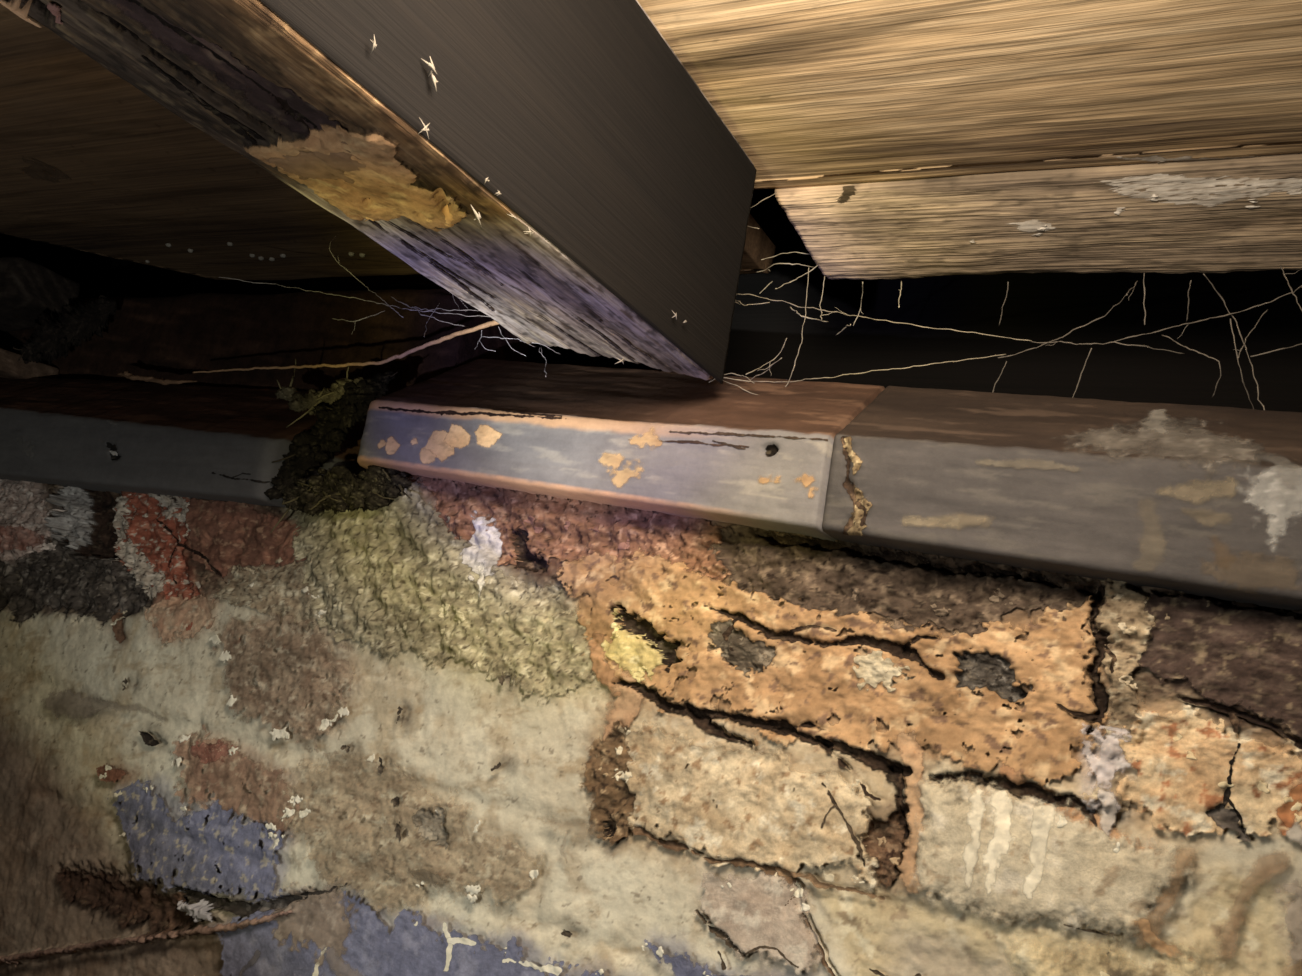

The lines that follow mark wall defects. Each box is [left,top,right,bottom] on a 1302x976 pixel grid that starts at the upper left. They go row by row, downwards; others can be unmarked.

corrosion [378,424,502,464]
leakage [460,511,503,600]
corrosion [599,428,662,487]
corrosion [796,474,814,498]
leakage [903,514,988,528]
leakage [978,460,1078,472]
leakage [1066,409,1302,548]
crack [710,607,945,680]
crack [1055,586,1117,734]
spalling [0,472,1302,976]
crack [1178,696,1302,842]
crack [612,680,1097,976]